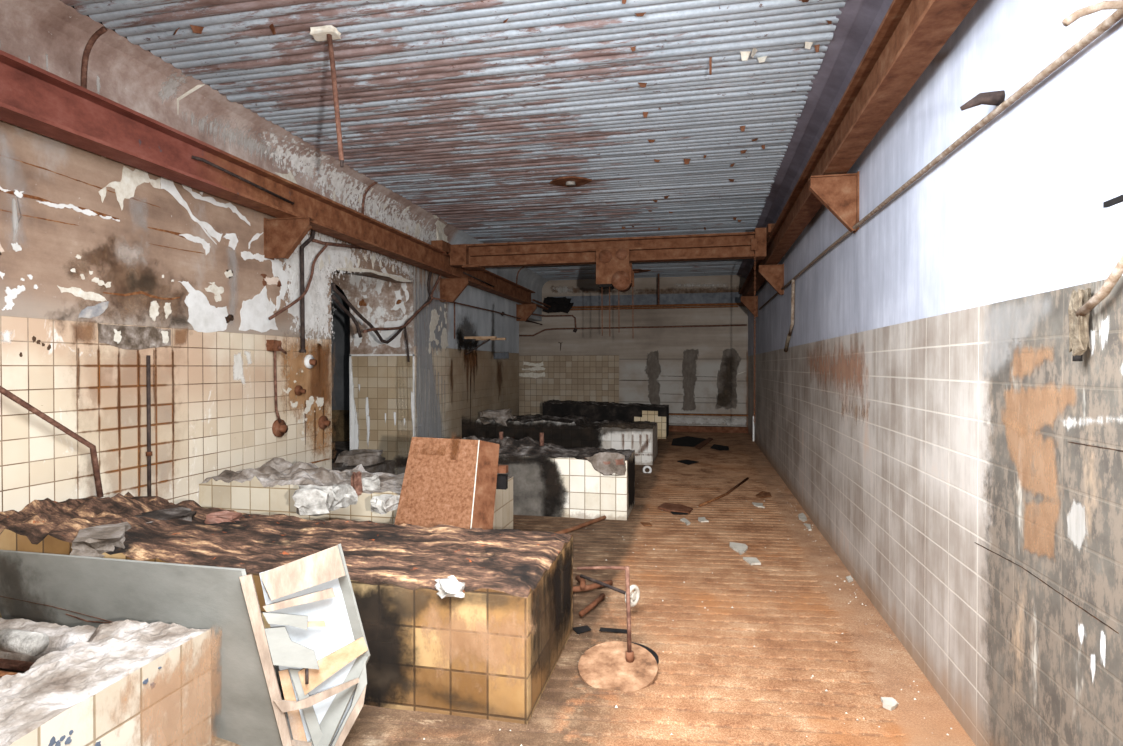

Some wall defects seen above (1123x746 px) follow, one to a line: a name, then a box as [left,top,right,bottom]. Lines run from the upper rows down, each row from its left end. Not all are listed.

peeling [159,73,448,244]
peeling [0,272,38,311]
peeling [57,166,416,350]
peeling [427,304,449,355]
rust [282,341,332,453]
leakage [1091,631,1106,682]